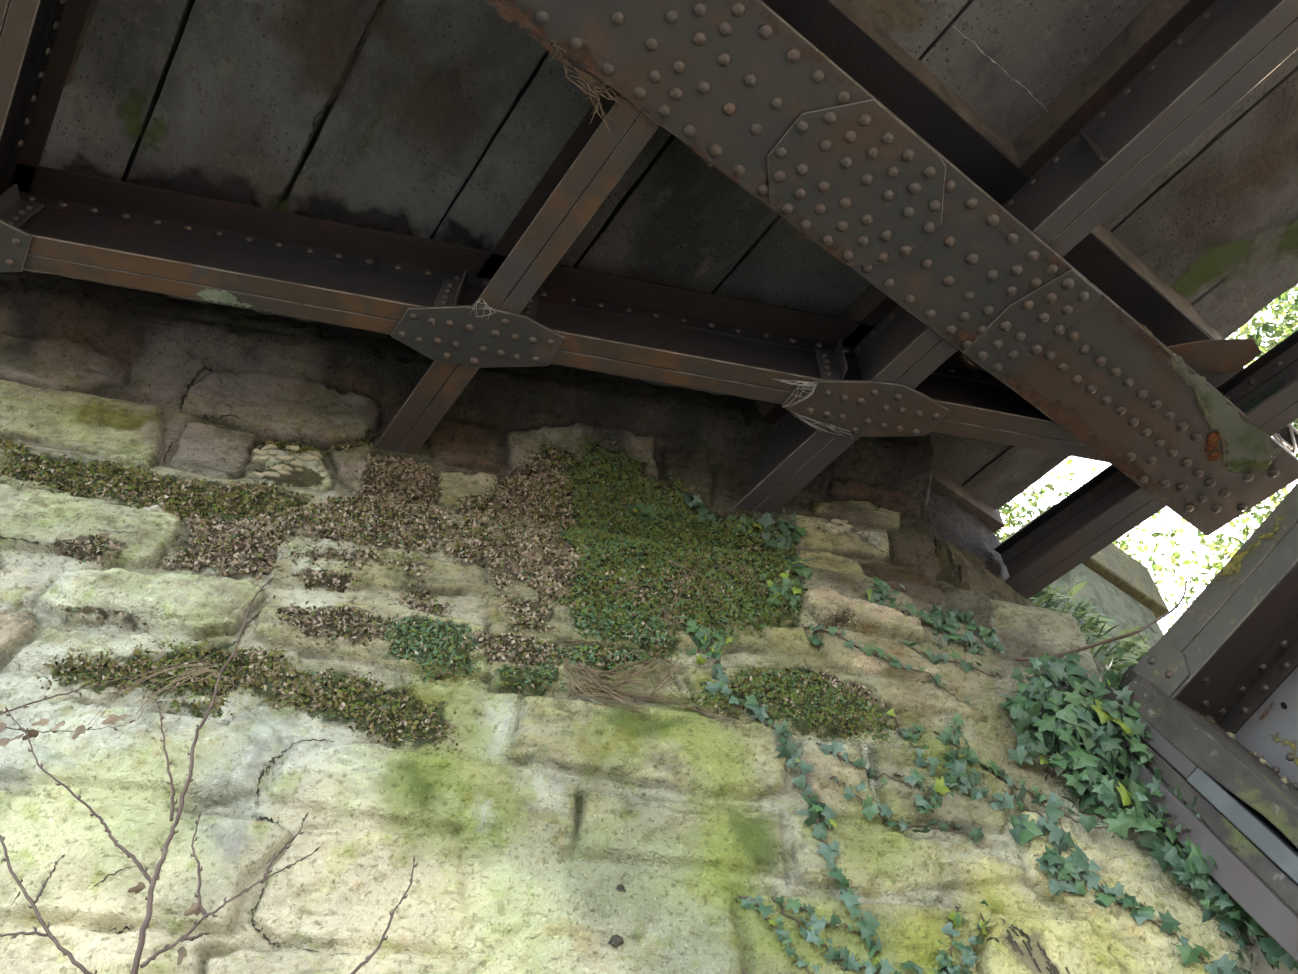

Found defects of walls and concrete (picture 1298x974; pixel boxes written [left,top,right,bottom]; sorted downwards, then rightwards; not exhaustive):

crack [161,366,240,466]
peeling [1131,317,1283,473]